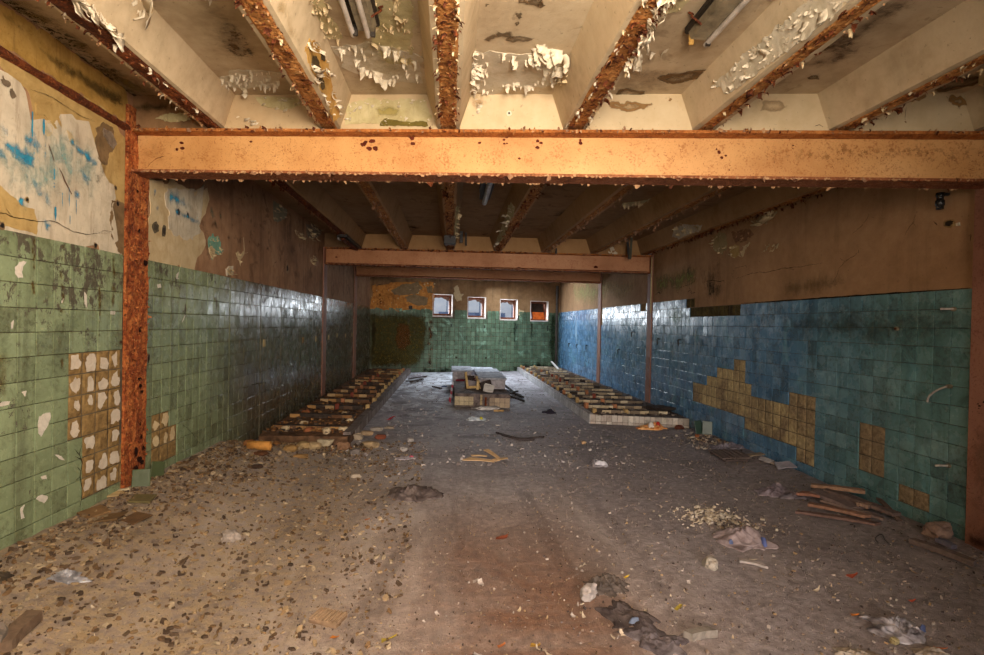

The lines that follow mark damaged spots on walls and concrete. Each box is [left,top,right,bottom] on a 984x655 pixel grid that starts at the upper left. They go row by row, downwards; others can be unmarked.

peeling [0,70,124,255]
peeling [72,0,125,52]
rust [36,0,286,133]
peeling [148,178,223,279]
rust [234,0,361,133]
peeling [305,0,432,145]
rust [418,0,487,133]
peeling [470,44,570,114]
rust [557,0,676,135]
rust [703,0,885,134]
rust [832,59,984,134]
peeling [67,350,121,499]